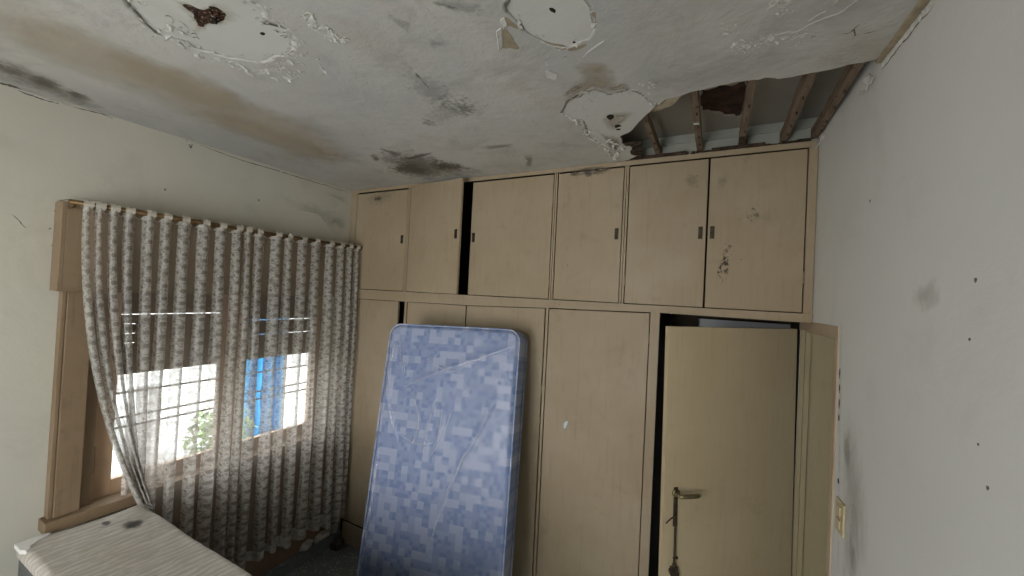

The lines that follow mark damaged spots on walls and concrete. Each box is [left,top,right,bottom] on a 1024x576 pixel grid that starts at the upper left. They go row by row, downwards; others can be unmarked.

peeling [109,0,305,66]
peeling [496,0,604,58]
peeling [559,80,824,165]
damp [374,151,458,182]